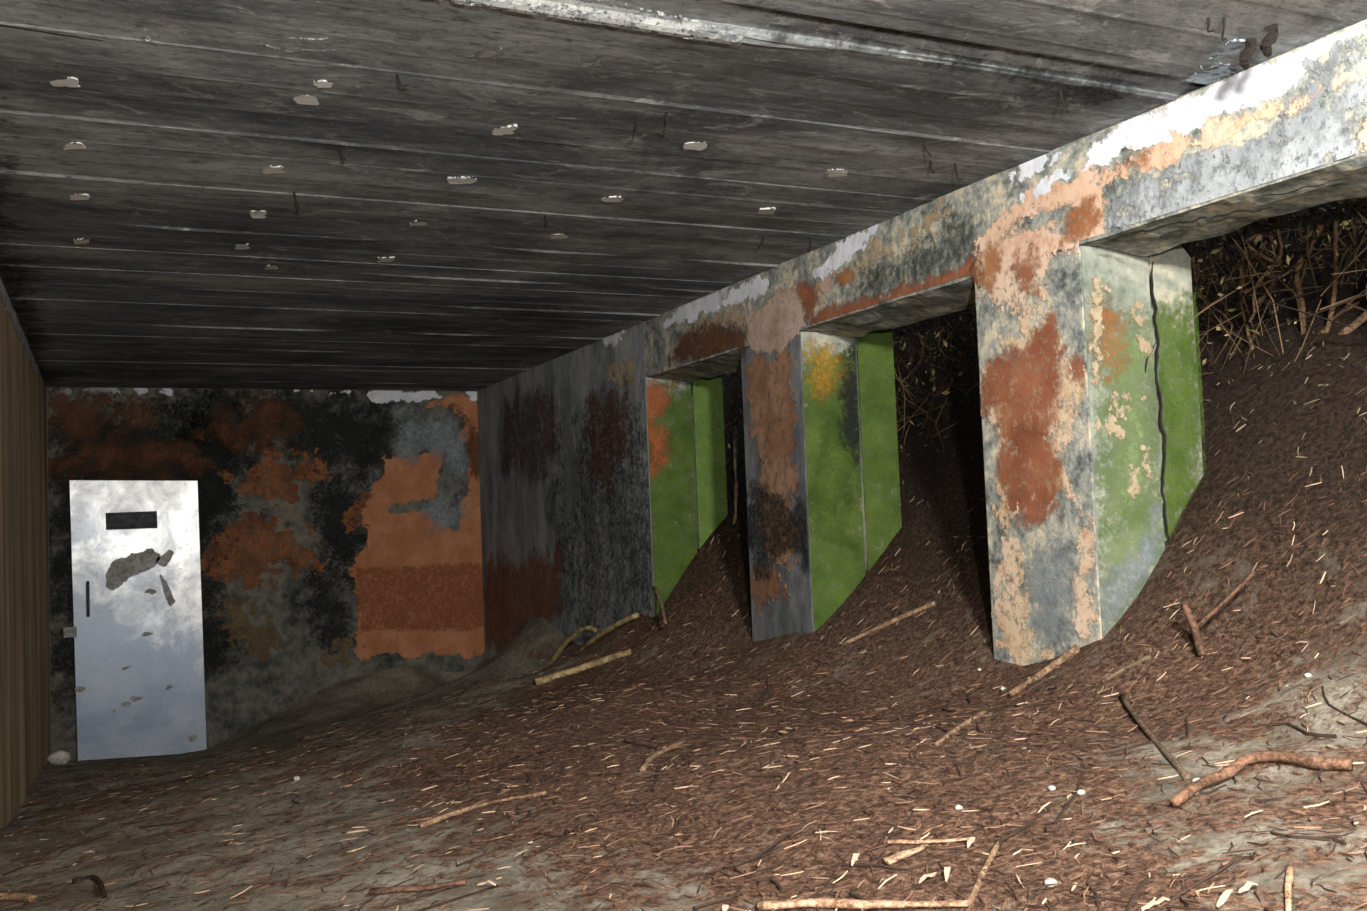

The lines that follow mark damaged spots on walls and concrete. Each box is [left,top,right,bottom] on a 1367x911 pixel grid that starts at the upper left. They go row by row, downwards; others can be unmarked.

water stain [0,155,64,383]
water stain [48,389,469,709]
peeling [200,446,332,667]
peeling [294,390,485,670]
water stain [518,387,651,643]
corrosion [980,308,1126,527]
spalling [971,20,1367,666]
crack [1102,177,1353,542]